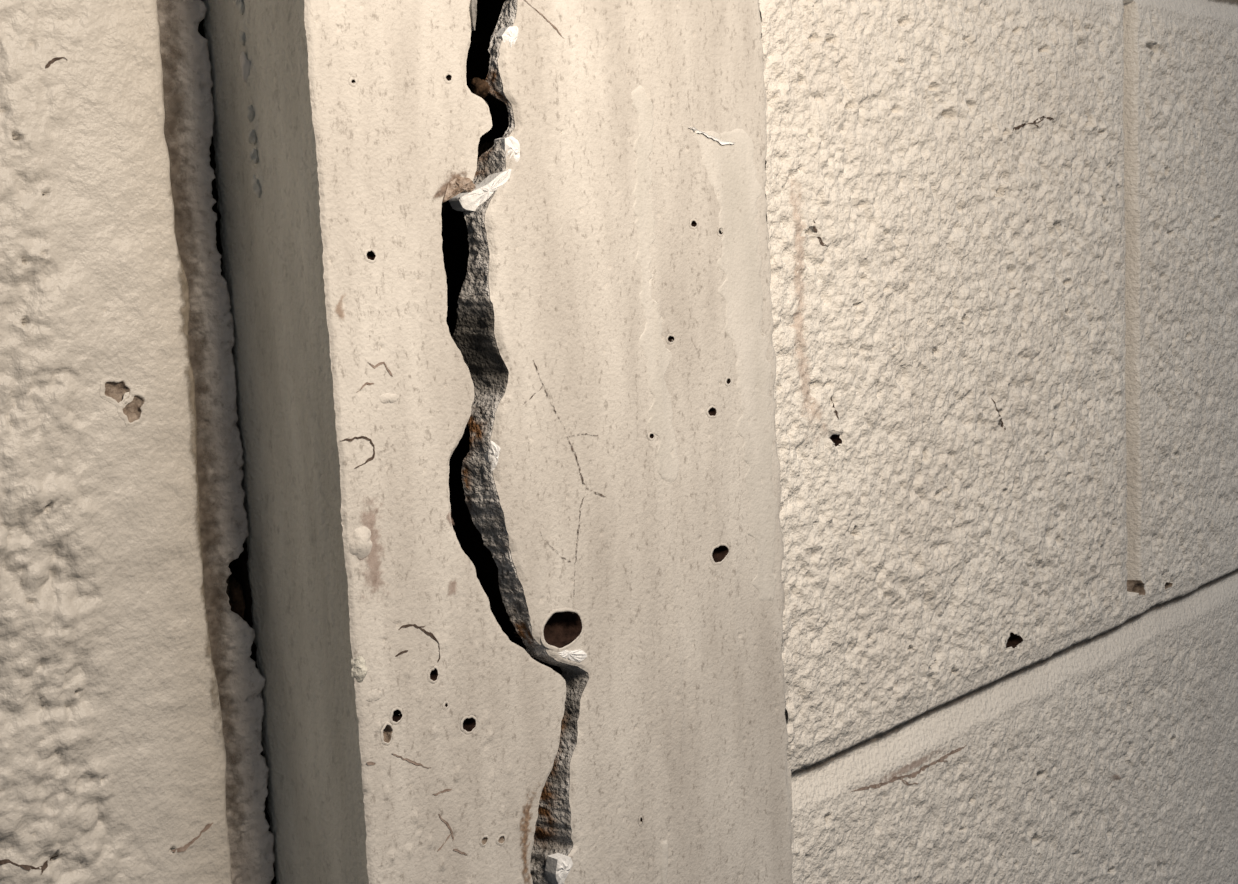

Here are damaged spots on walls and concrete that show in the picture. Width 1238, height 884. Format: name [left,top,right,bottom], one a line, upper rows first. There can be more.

crack [197,19,205,38]
crack [209,112,228,291]
spalling [99,377,148,428]
leakage [158,4,244,824]
crack [441,0,605,884]
crack [225,503,276,884]